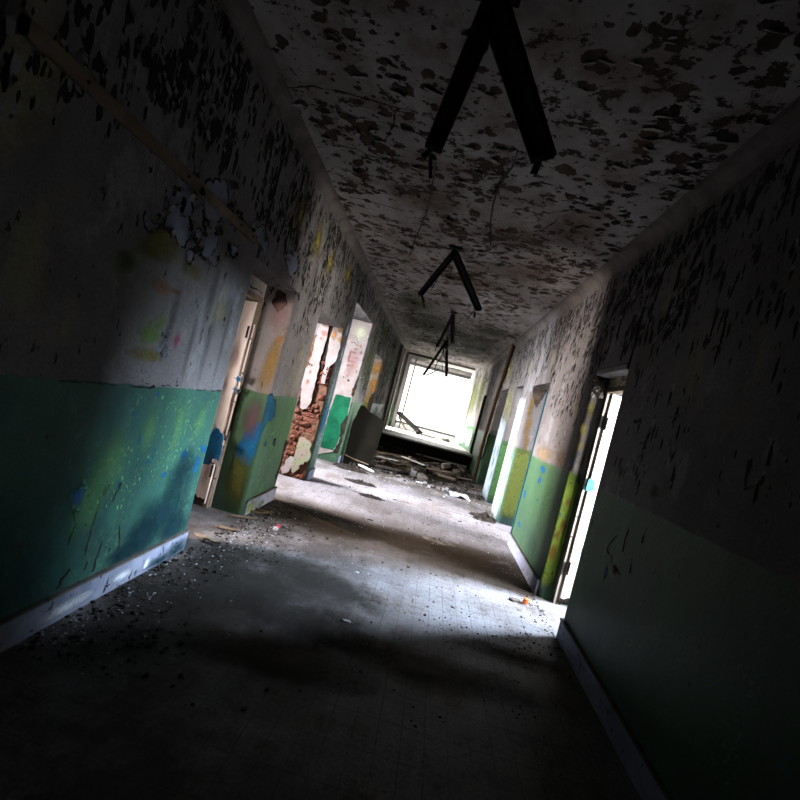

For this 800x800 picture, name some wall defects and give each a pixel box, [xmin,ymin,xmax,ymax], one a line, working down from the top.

peeling [0,0,85,110]
peeling [756,0,800,61]
peeling [53,0,771,495]